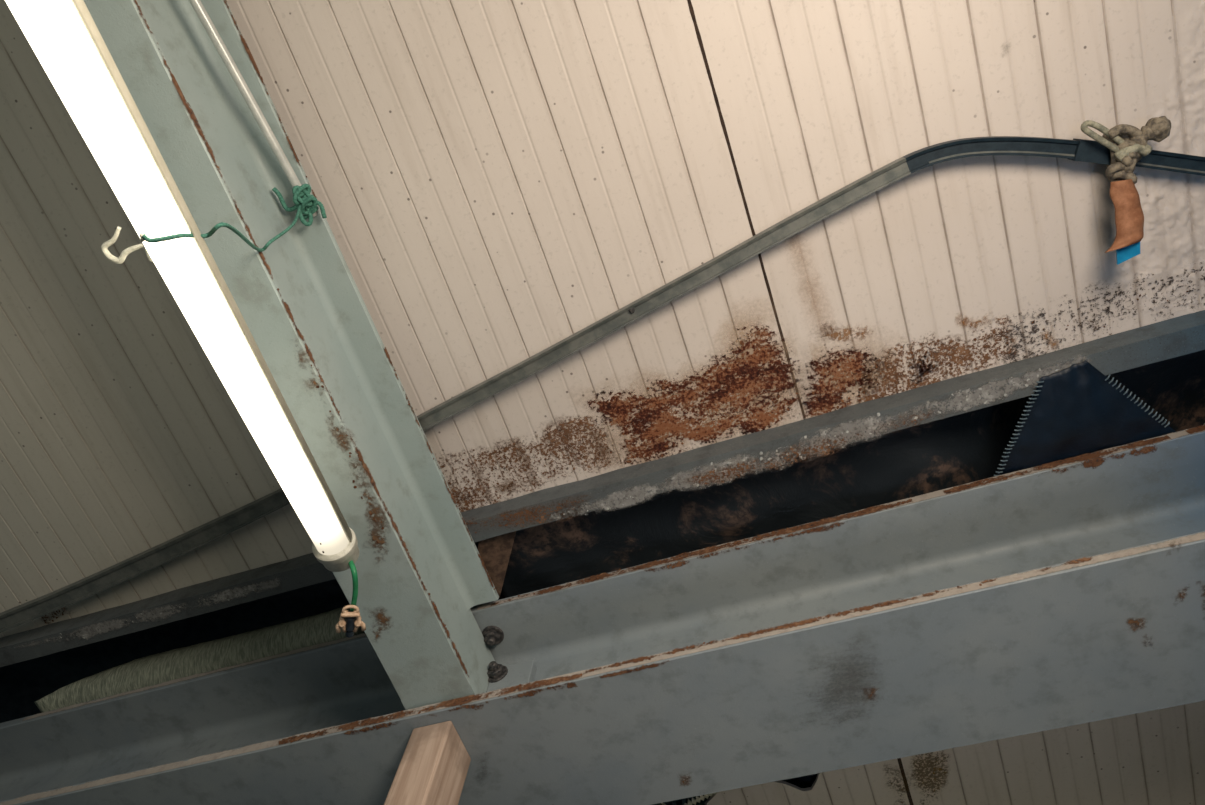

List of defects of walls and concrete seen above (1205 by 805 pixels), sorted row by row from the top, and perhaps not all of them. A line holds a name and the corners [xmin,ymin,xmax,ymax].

rust [158,48,223,177]
leakage [1004,263,1205,364]
rust [234,201,468,675]
rust [384,317,1017,606]
rust [276,586,962,745]